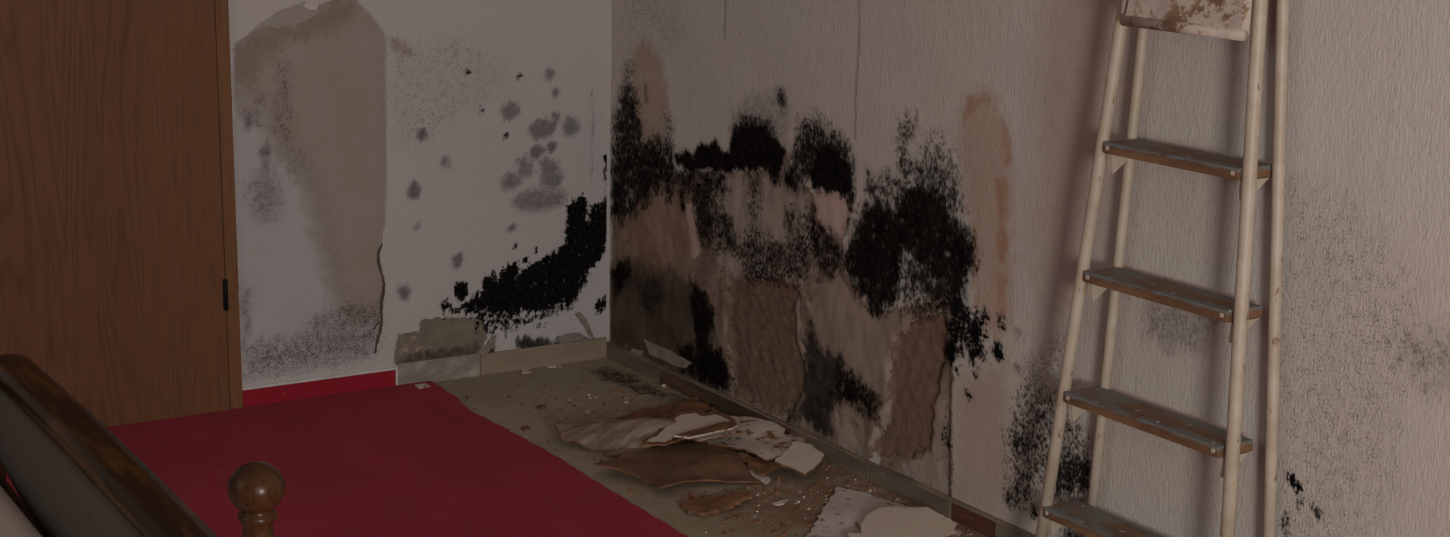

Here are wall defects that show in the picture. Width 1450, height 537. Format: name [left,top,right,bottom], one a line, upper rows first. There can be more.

water stain [244,305,379,379]
water stain [410,182,420,198]
water stain [441,49,1092,520]
peeling [610,166,956,497]